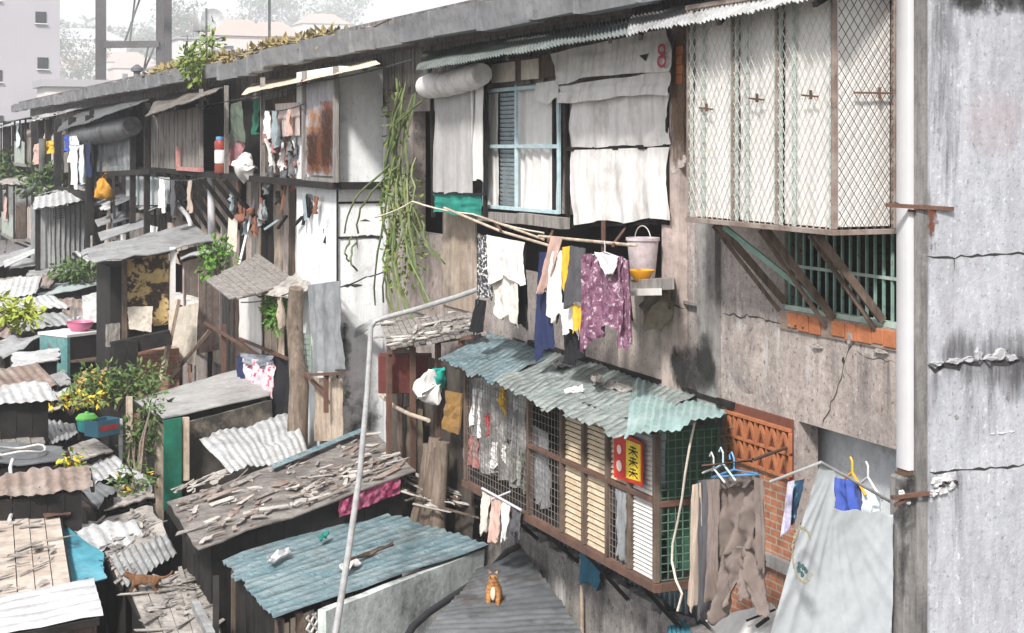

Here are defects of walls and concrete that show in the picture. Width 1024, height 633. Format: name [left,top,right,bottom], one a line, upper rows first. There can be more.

rust [305,80,333,176]
rust [927,210,937,236]
crack [928,251,1024,269]
crack [723,313,780,324]
damp [671,333,715,392]
crack [822,346,896,426]
spalling [930,473,959,497]